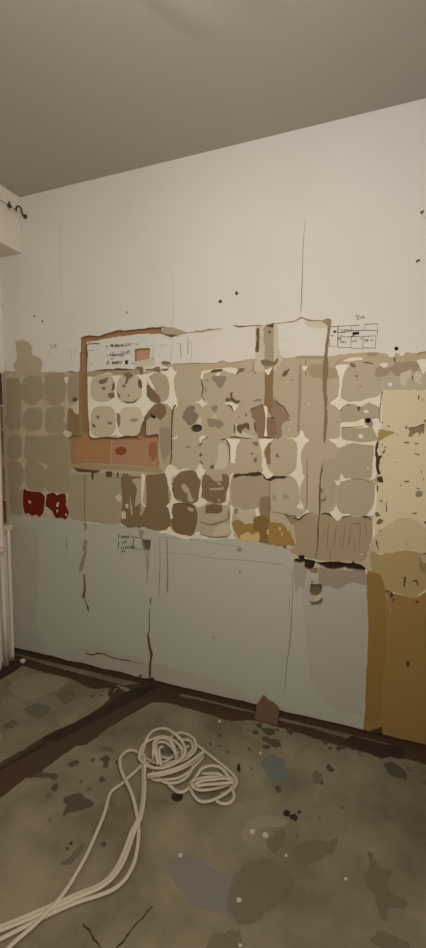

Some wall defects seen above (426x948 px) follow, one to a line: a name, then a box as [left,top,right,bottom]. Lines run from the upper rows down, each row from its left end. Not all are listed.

crack [95,365,134,373]
flaking render [305,319,332,328]
peeling [0,324,426,571]
crack [150,221,387,685]
crack [85,547,168,678]
crack [83,906,153,948]